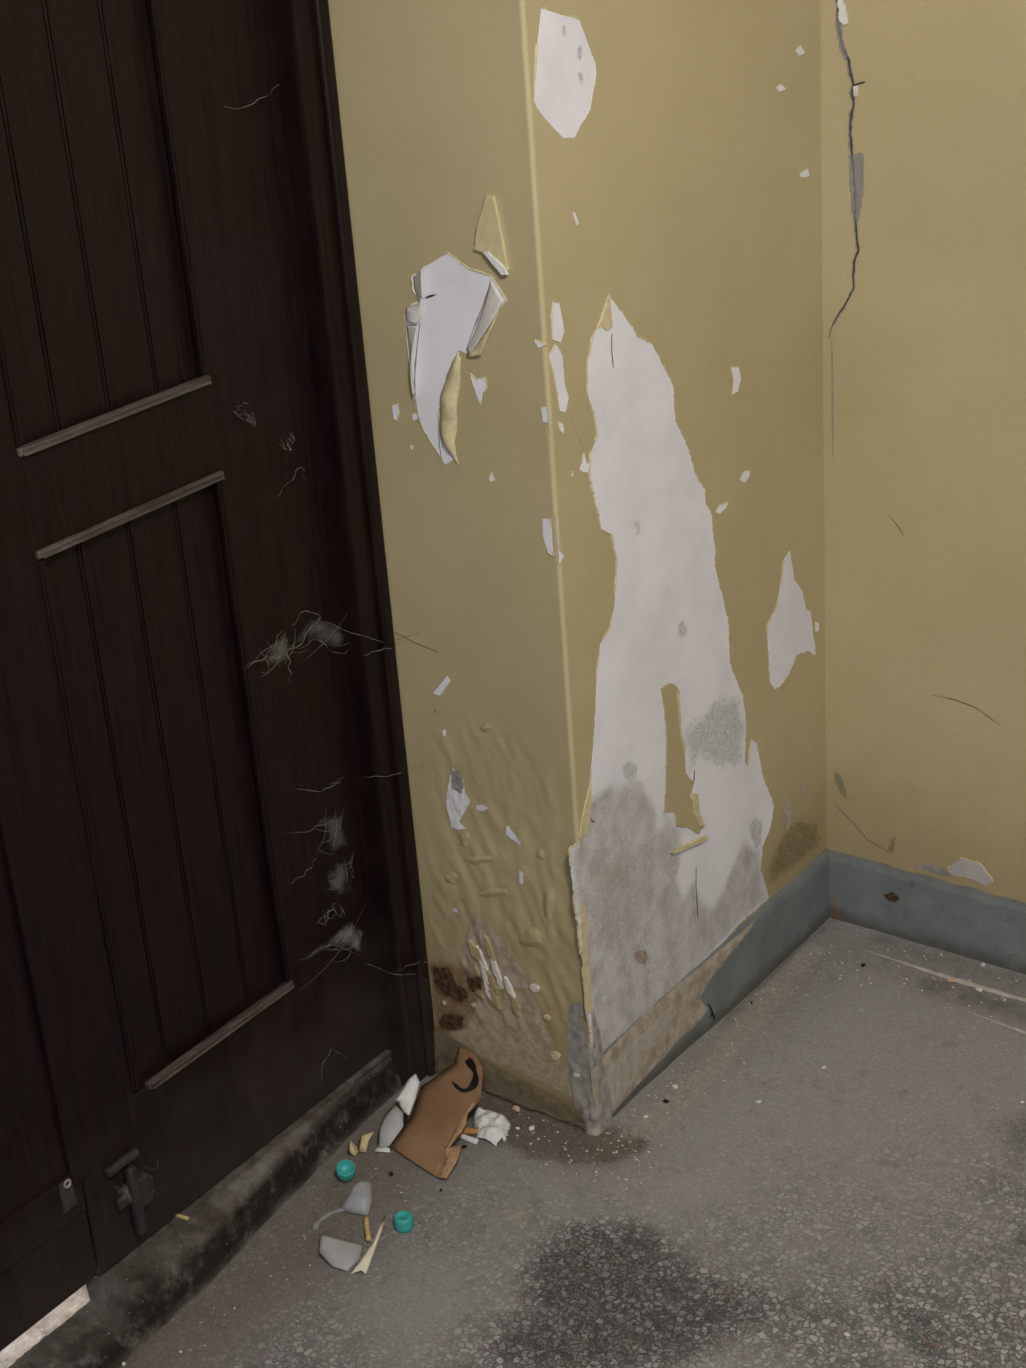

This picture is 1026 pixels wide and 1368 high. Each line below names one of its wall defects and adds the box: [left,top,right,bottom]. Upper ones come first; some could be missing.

peeling [533,7,597,140]
crack [829,0,865,451]
peeling [392,195,509,466]
peeling [432,676,450,696]
peeling [442,294,775,1136]
peeling [766,550,819,690]
peeling [915,857,994,888]
water stain [474,1215,786,1368]